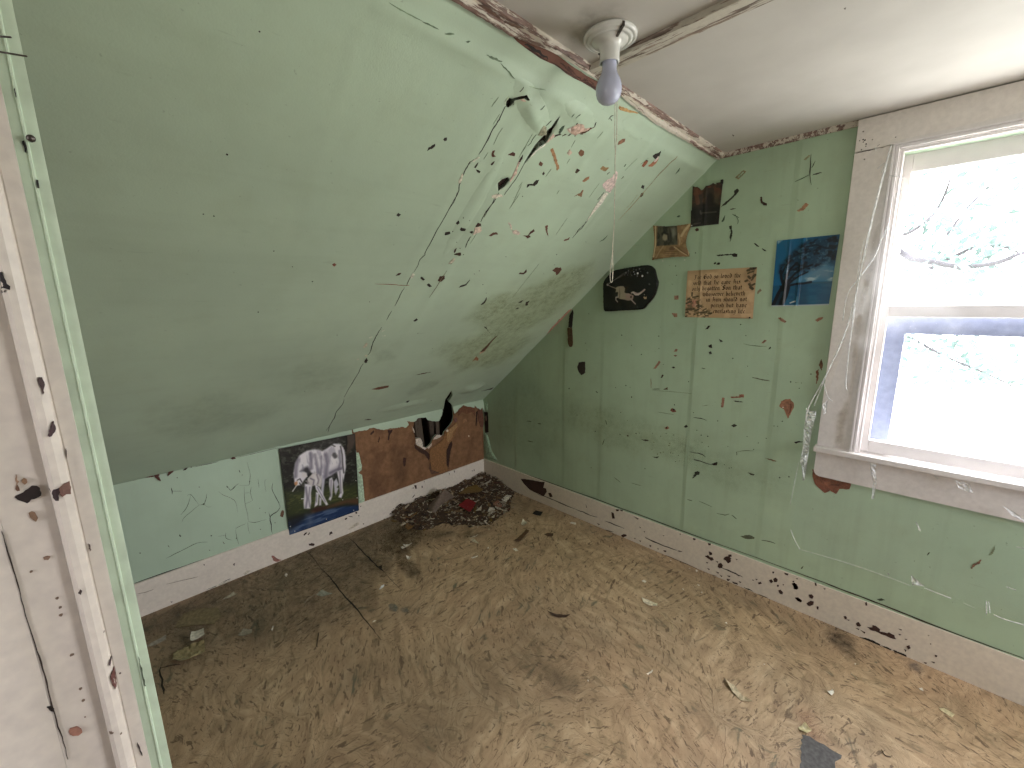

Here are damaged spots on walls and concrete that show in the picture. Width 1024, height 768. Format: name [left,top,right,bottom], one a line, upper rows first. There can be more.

peeling [479,4,524,29]
peeling [527,148,584,187]
crack [328,106,536,431]
peeling [779,399,794,418]
peeling [345,392,487,530]
peeling [15,481,71,503]
peeling [812,469,851,494]
crack [166,467,284,559]
peeling [705,543,826,609]
crack [2,532,68,759]
peeling [843,616,910,649]
peeling [69,726,82,736]